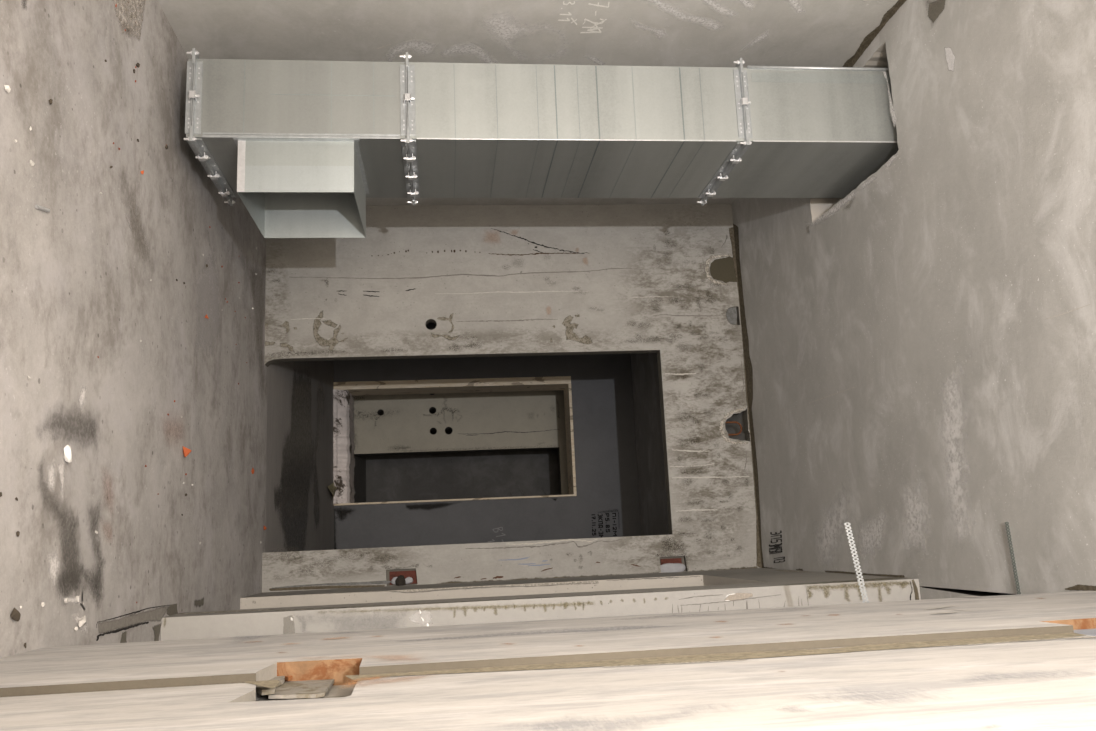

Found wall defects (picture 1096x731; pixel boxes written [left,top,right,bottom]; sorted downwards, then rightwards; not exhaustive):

water stain [52,388,95,438]
water stain [41,464,102,603]